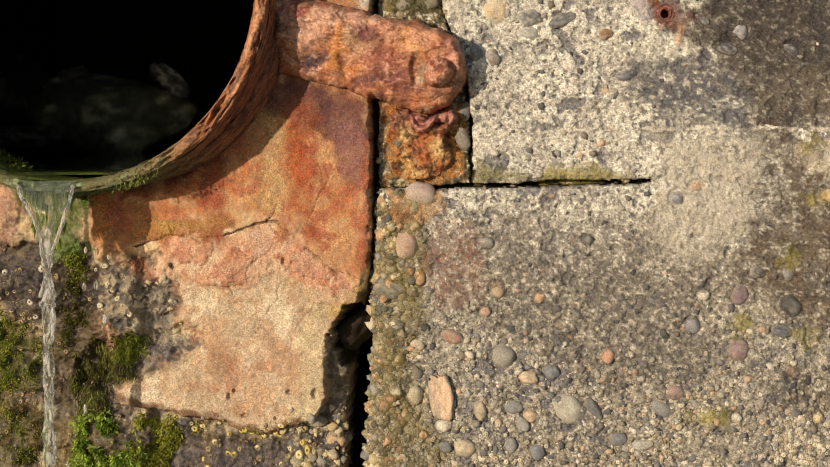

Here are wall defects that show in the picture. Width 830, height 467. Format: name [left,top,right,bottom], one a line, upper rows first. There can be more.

crack [134,205,289,248]
rust [381,100,466,222]
crack [434,84,651,189]
leakage [629,0,830,329]
leakage [0,195,105,413]
crack [349,334,373,467]